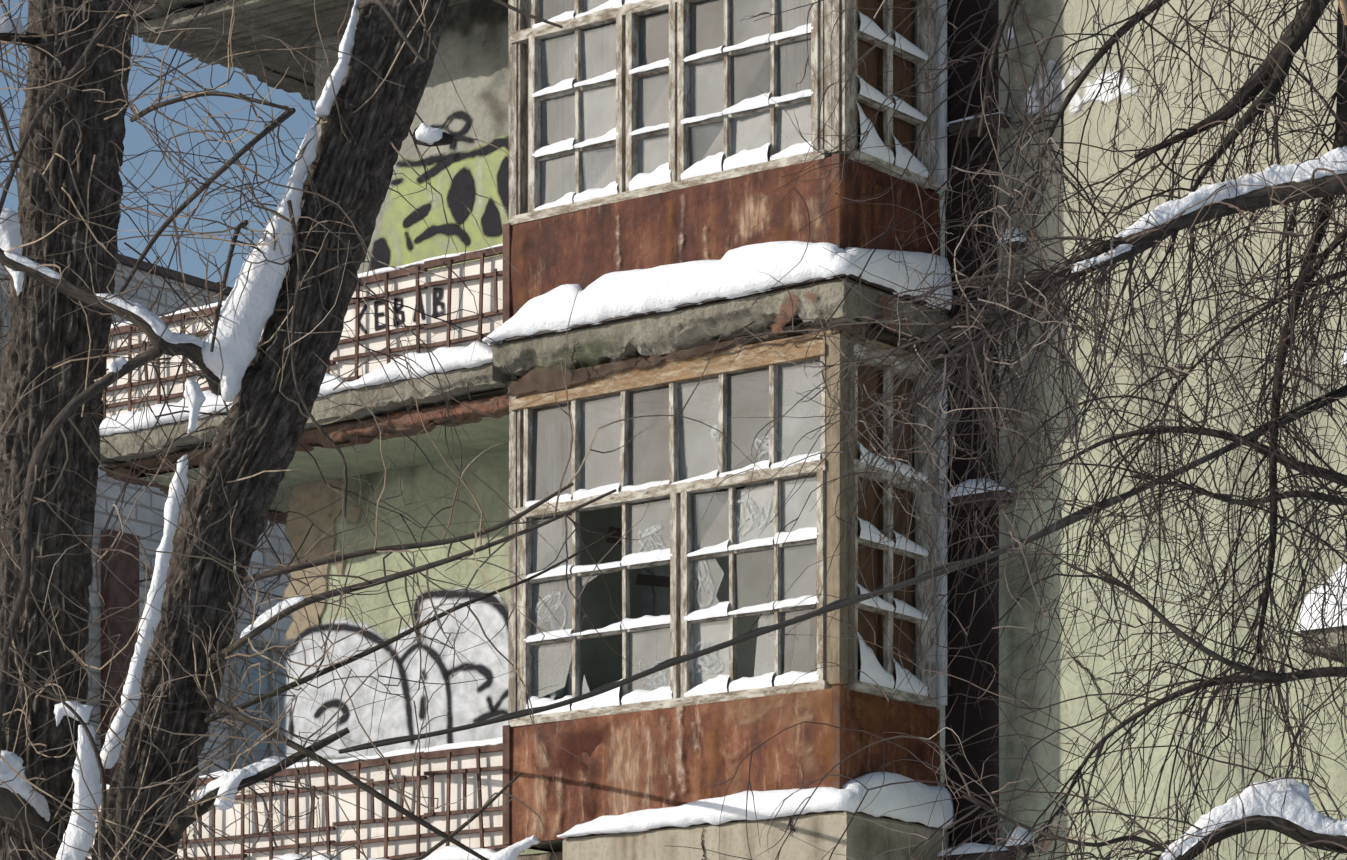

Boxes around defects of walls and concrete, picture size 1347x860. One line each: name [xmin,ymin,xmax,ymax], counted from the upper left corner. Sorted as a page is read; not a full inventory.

corrosion [554,726,607,776]